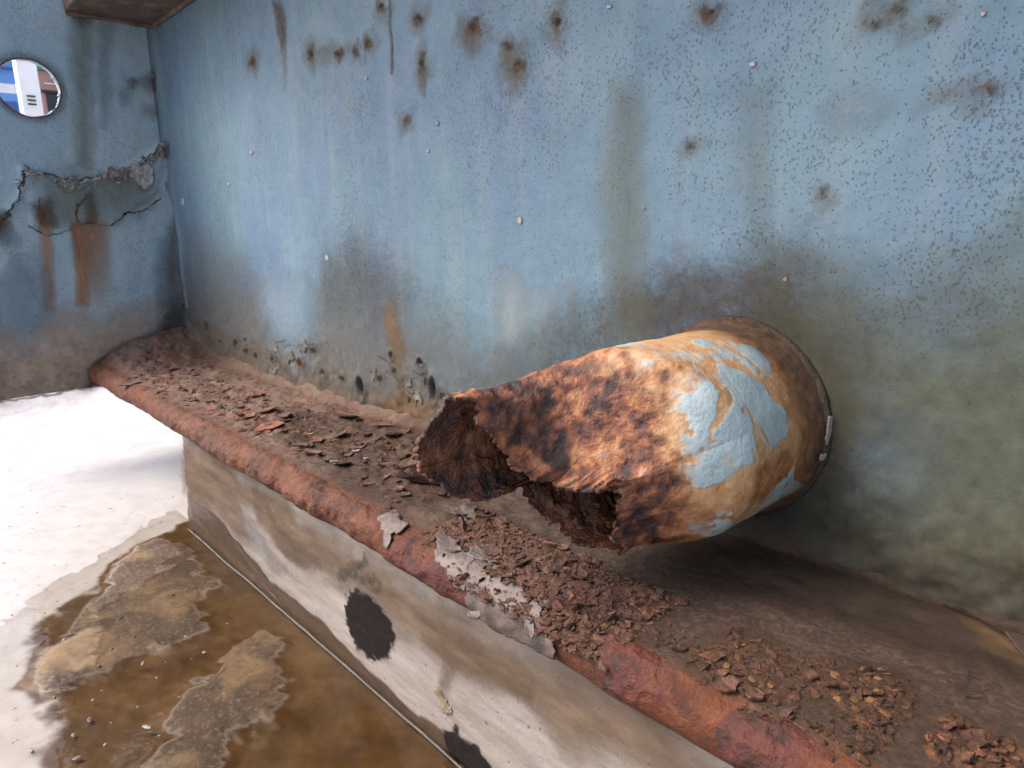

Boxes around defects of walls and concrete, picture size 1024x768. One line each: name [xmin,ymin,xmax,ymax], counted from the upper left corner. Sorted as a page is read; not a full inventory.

corrosion [334,40,371,59]
corrosion [465,17,479,34]
corrosion [33,204,53,311]
corrosion [73,195,101,304]
crack [28,194,161,236]
leakage [161,233,281,375]
leakage [304,300,469,424]
peeling [377,509,409,549]
peeling [393,459,439,484]
peeling [451,503,487,522]
leakage [183,447,705,768]
peeling [434,533,556,660]